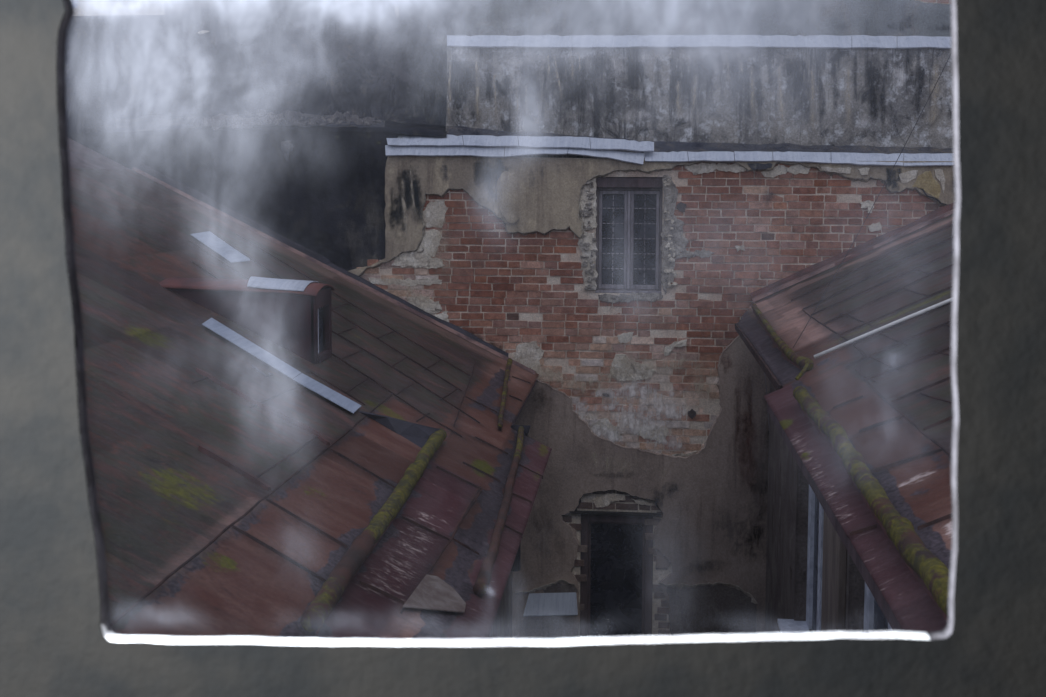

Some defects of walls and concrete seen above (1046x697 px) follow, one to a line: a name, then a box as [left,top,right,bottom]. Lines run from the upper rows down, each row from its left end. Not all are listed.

leakage [499,50,772,119]
leakage [780,58,937,121]
leakage [390,170,421,230]
spalling [356,161,946,459]
peeling [515,490,758,636]